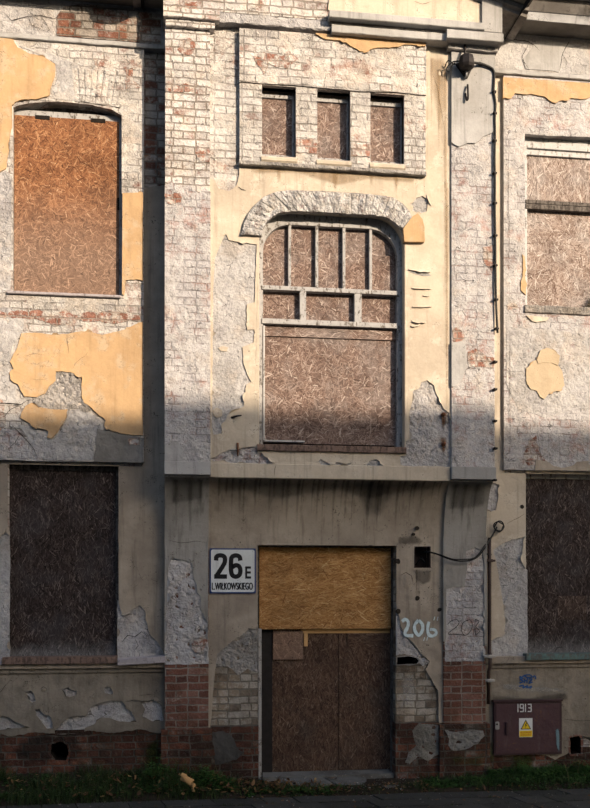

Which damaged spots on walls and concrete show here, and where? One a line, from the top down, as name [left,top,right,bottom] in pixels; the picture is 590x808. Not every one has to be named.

peeling [315,33,425,53]
peeling [502,77,590,104]
peeling [0,38,78,293]
peeling [0,307,143,463]
peeling [211,235,257,435]
peeling [400,381,451,467]
spalling [506,315,590,417]
peeling [0,526,10,658]
peeling [117,558,258,675]
peeling [437,536,528,662]
peeling [27,687,163,730]
spalling [405,723,485,764]